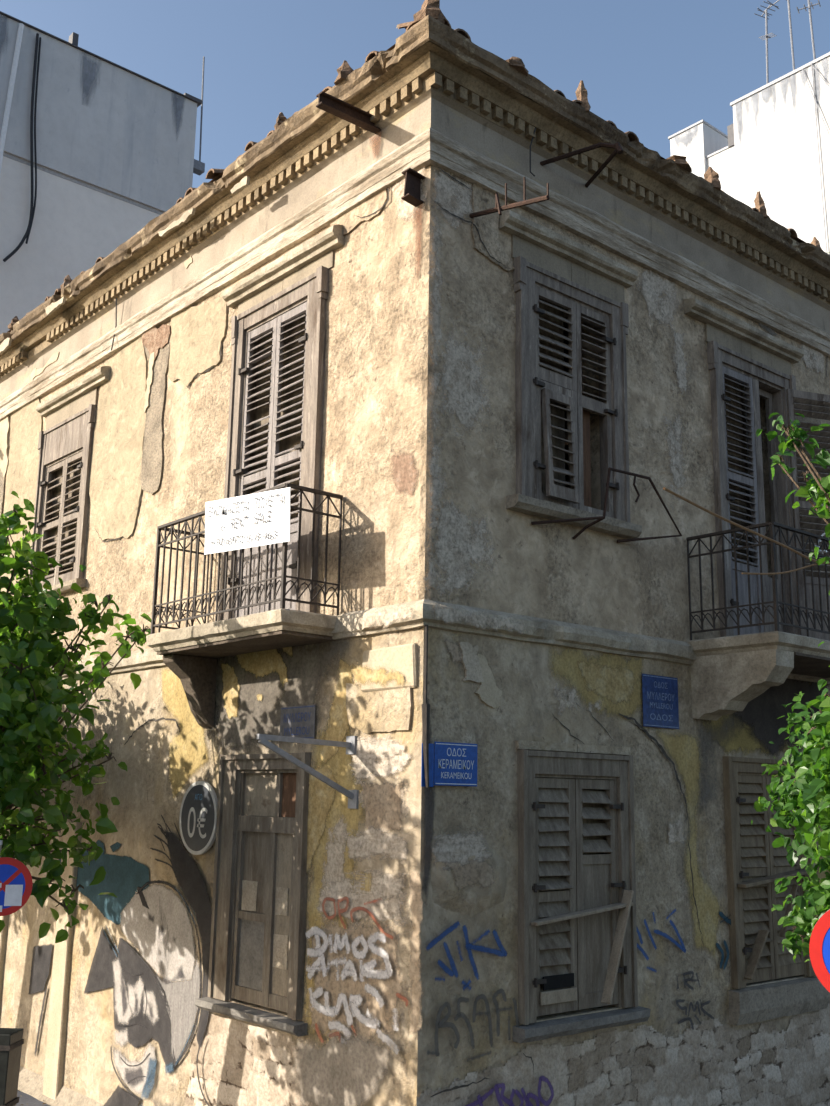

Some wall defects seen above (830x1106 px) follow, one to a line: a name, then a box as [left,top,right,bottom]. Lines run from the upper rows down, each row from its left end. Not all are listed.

flaking render [330,167,515,432]
flaking render [89,297,228,542]
peeling [161,668,208,796]
peeling [221,647,293,719]
flaking render [185,659,422,1106]
peeling [359,605,413,626]
flaking render [391,443,526,634]
flaking render [445,640,502,708]
peeling [550,648,643,717]
crack [553,690,704,945]
peeling [659,732,719,956]
flaking render [417,1001,830,1106]